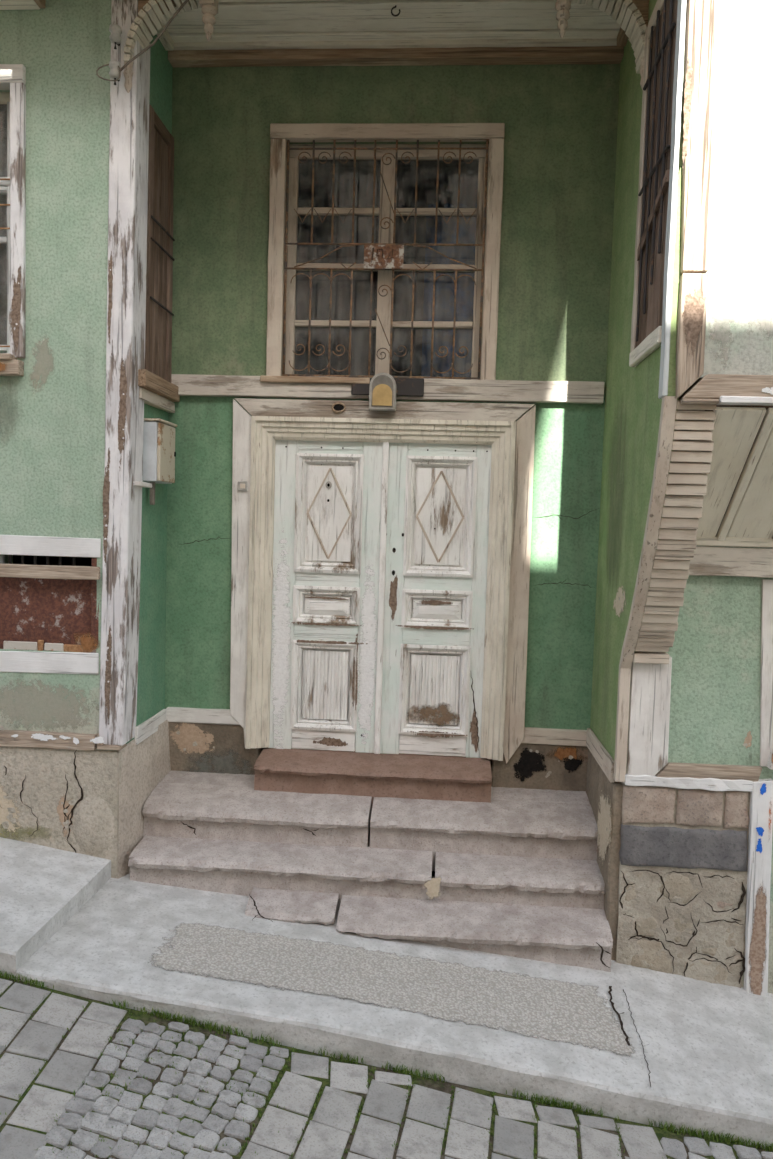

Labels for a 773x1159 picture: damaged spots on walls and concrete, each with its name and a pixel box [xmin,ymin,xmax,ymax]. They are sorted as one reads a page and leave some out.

peeling [682,289,706,356]
peeling [102,251,127,563]
rust [0,558,99,653]
peeling [169,722,215,754]
peeling [407,704,478,752]
spalling [513,748,582,782]
crack [0,750,83,852]